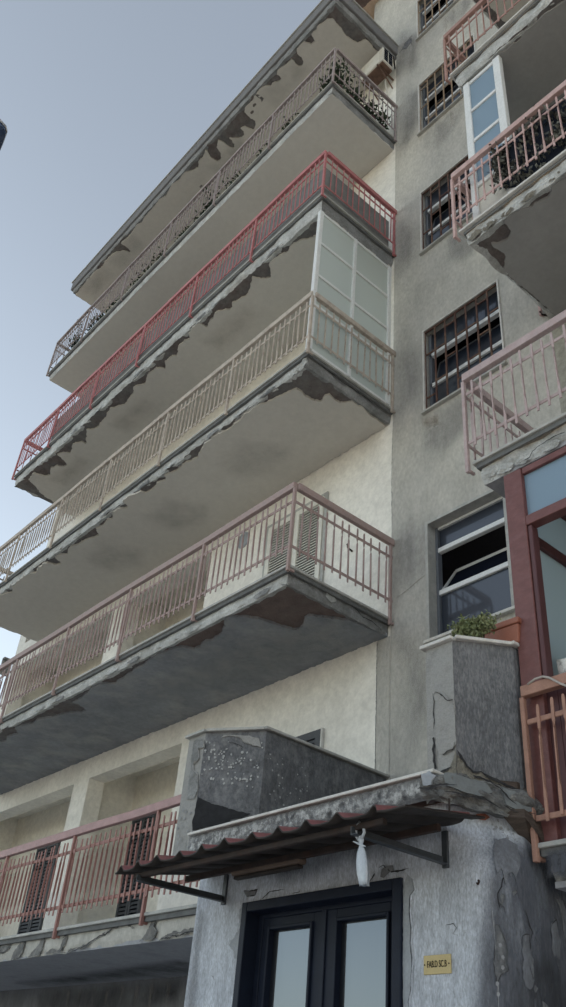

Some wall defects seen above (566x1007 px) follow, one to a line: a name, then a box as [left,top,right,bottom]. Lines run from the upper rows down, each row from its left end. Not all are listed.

spalling [303,6,378,51]
spalling [474,0,505,28]
spalling [486,0,563,61]
spalling [184,94,264,170]
spalling [468,171,560,309]
spalling [14,212,318,499]
spalling [23,358,390,576]
spalling [234,587,346,628]
spalling [0,620,224,741]
crack [432,697,527,791]
spalling [418,771,545,820]
flaking render [493,838,521,885]